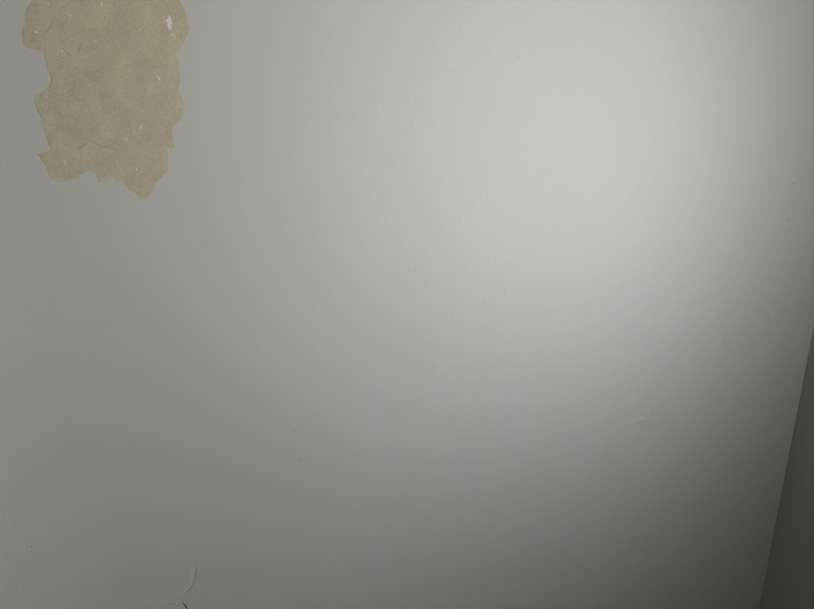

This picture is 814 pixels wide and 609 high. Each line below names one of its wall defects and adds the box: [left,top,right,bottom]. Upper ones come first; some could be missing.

peeling [21,0,190,199]